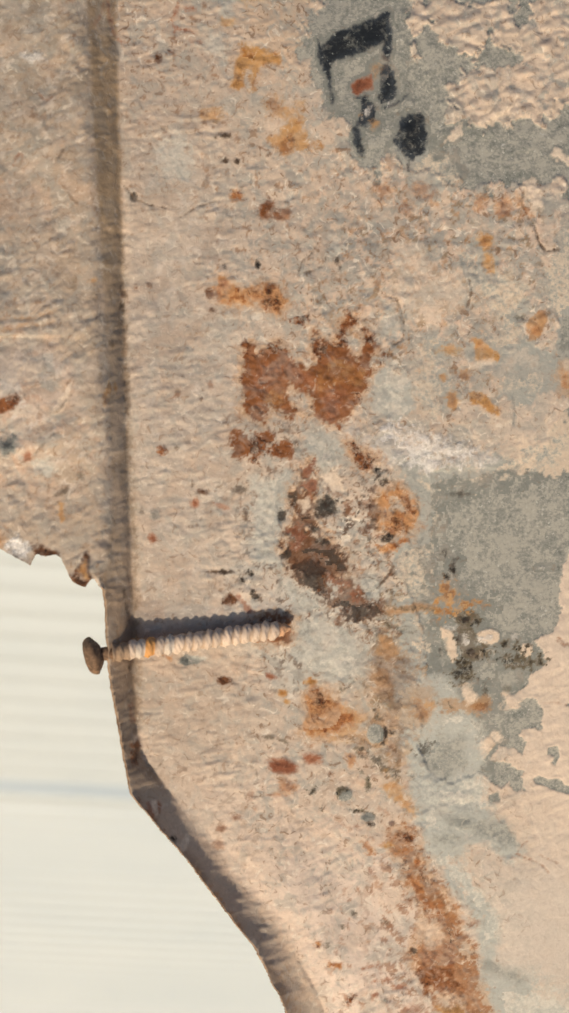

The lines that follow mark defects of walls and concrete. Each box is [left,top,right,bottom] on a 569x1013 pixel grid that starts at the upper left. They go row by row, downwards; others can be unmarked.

peeling [238,0,569,692]
rust [143,441,178,473]
rust [142,503,165,548]
rust [186,484,216,514]
rust [194,243,435,856]
rust [108,610,129,651]
rust [122,698,150,778]
rust [134,794,261,948]
rust [310,770,505,1013]
peeling [406,668,569,1013]
rust [268,954,323,1013]